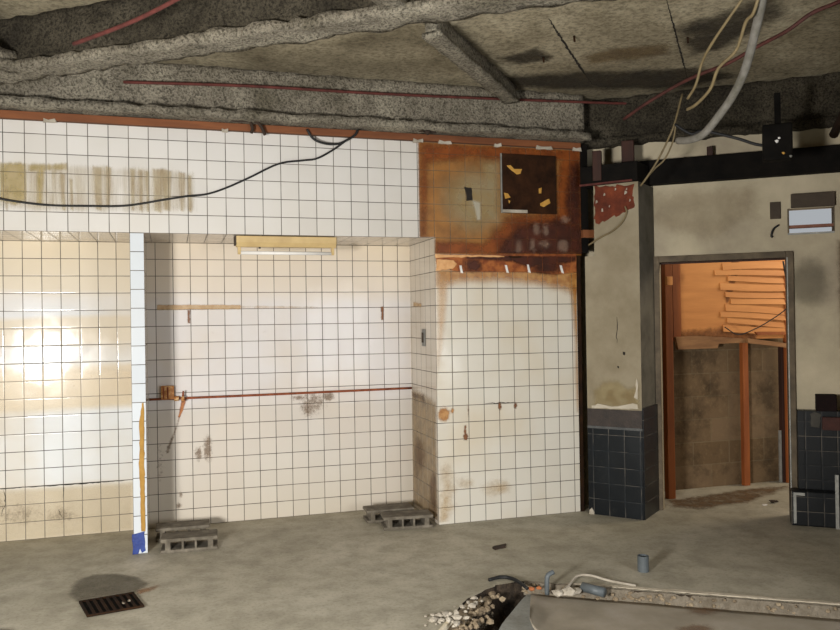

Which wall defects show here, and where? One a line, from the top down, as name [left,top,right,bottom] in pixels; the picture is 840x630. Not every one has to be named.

water stain [505,49,551,64]
water stain [588,47,664,62]
water stain [507,68,732,89]
water stain [1,164,44,204]
corrosion [419,142,582,339]
water stain [294,393,332,414]
corrosion [439,408,454,421]
water stain [413,393,436,519]